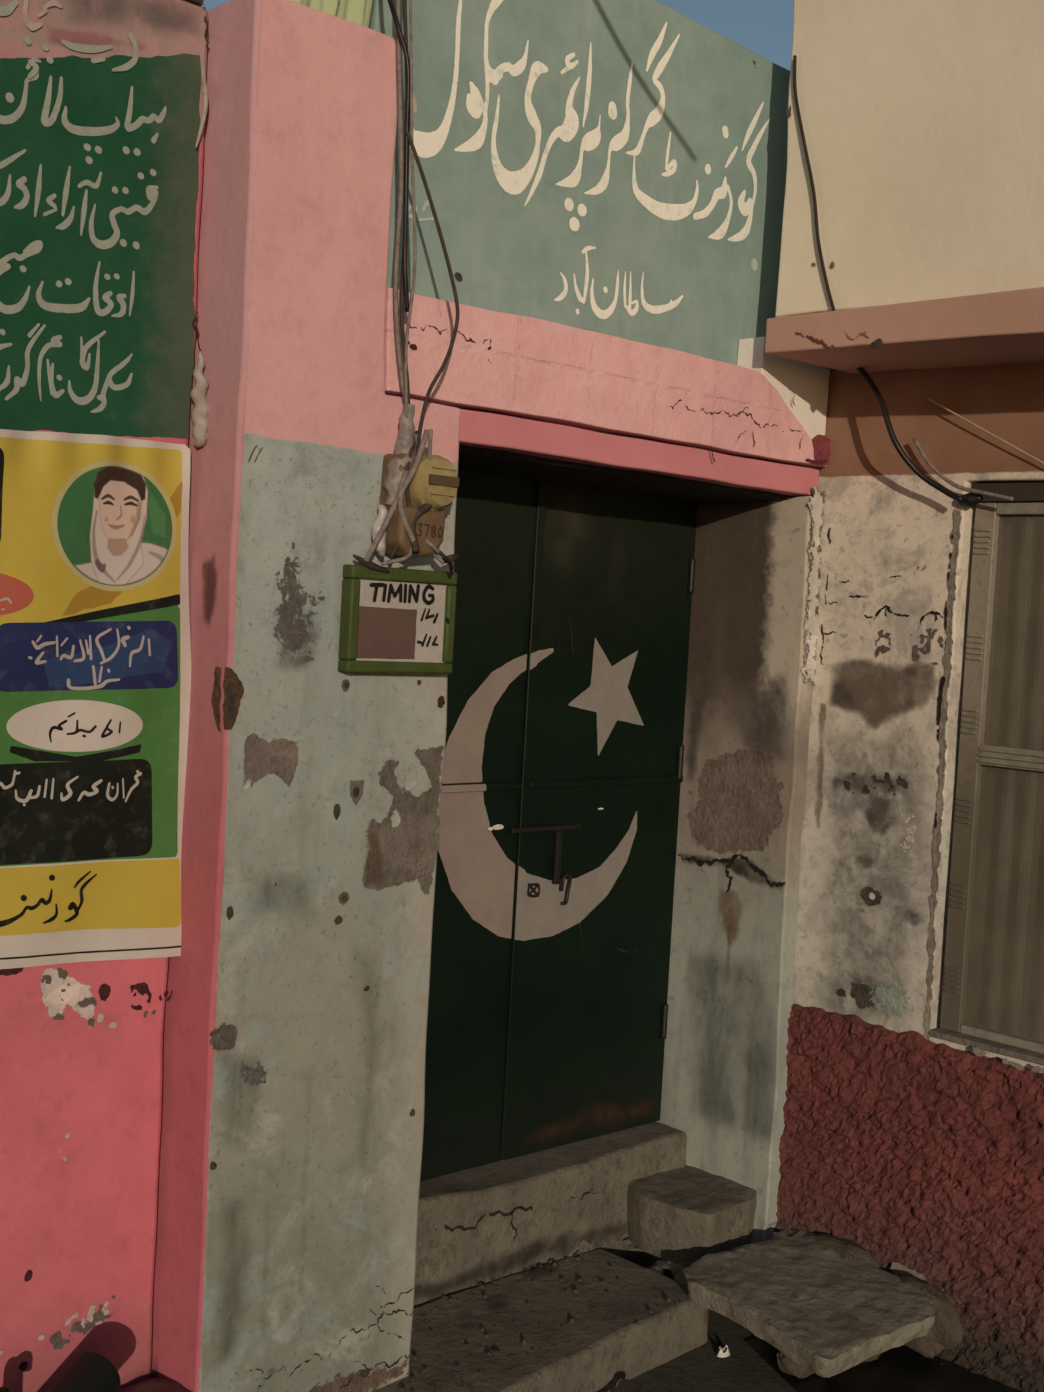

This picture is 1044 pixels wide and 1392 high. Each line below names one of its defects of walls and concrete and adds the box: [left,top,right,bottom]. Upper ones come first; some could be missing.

flaking render [211,667,244,732]
leakage [831,661,933,728]
peeling [243,733,304,790]
peeling [333,745,444,895]
flaking render [687,749,784,857]
crack [678,854,789,893]
flaking render [0,968,23,976]
peeling [38,967,117,1028]
peeling [130,982,172,1018]
crack [436,1206,533,1241]
peeling [38,1295,116,1349]
crack [235,1286,421,1392]